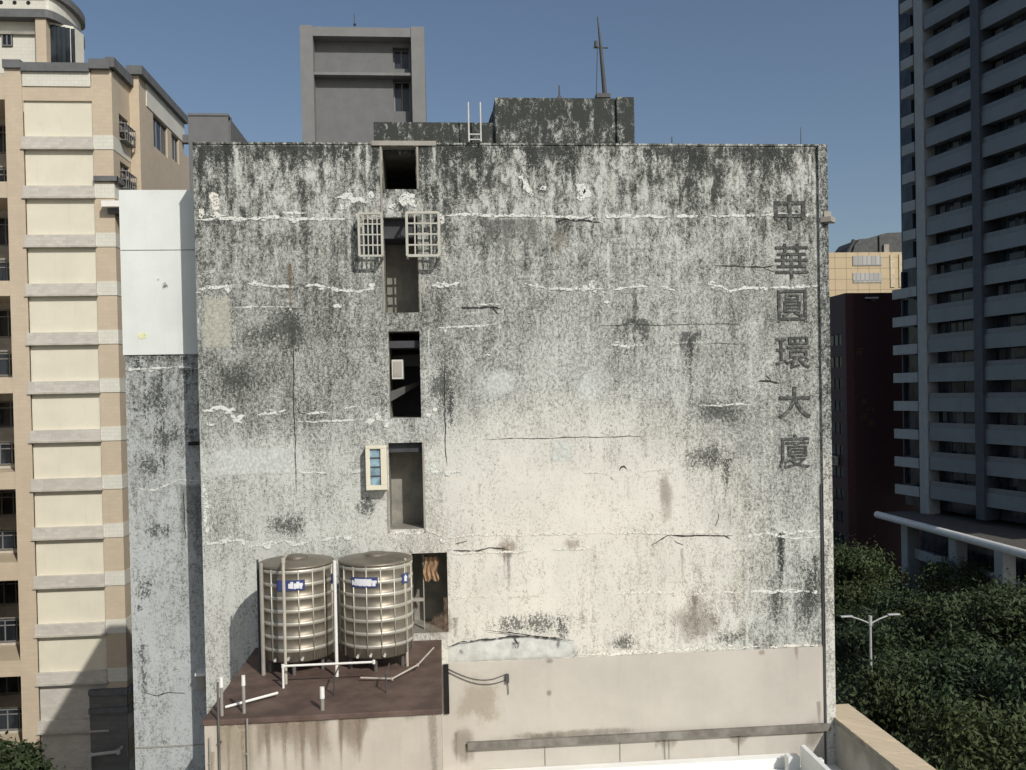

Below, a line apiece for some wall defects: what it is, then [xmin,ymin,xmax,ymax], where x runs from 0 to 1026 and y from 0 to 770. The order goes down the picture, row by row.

leakage [197,145,238,198]
leakage [252,144,378,196]
peeling [197,191,374,223]
leakage [421,146,490,244]
peeling [440,211,698,224]
crack [715,264,777,272]
peeling [305,283,375,308]
crack [458,306,501,314]
peeling [202,405,244,426]
crack [652,514,733,545]
crack [453,541,508,552]
leakage [498,614,571,639]